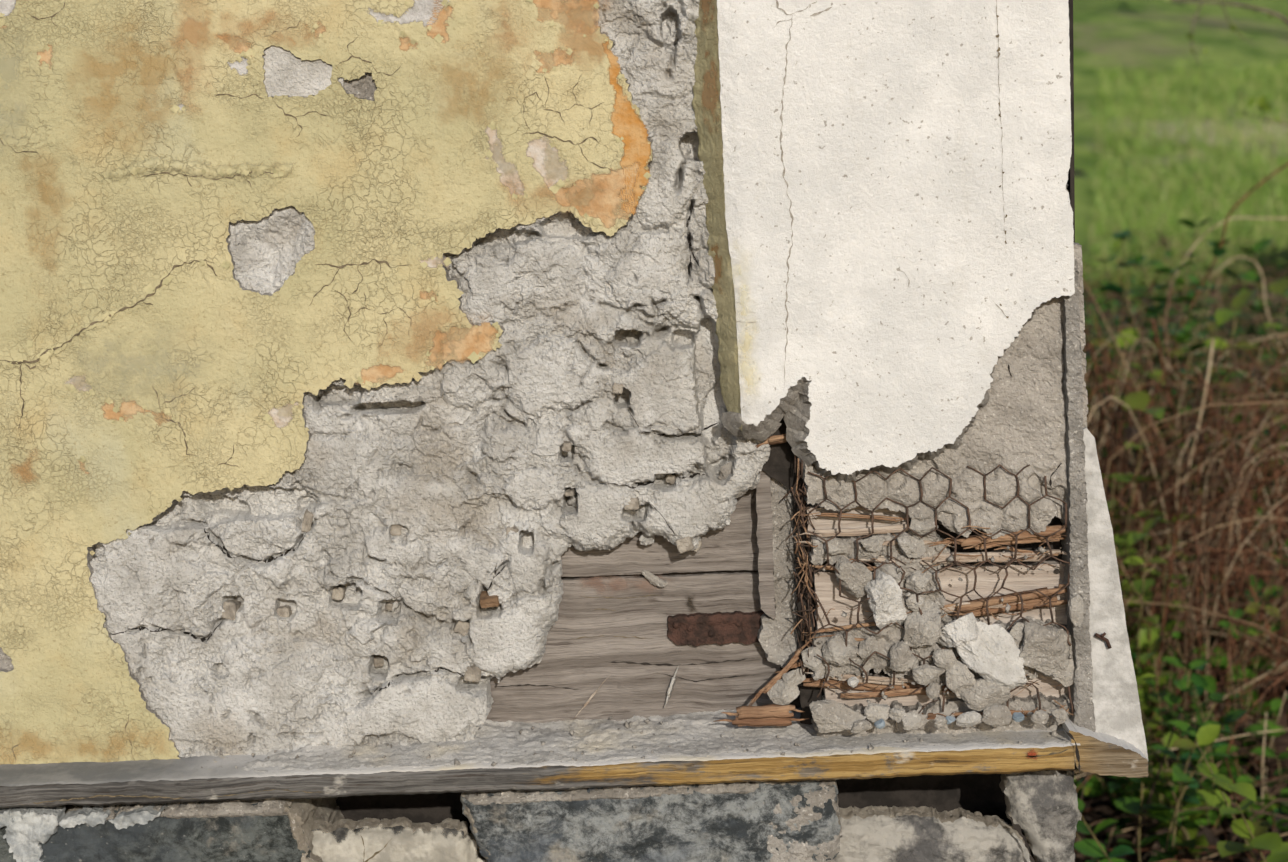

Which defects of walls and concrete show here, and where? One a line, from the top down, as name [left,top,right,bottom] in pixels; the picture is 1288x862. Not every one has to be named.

crack [522,73,616,172]
crack [737,0,832,384]
crack [4,259,230,429]
spalling [90,0,772,758]
spalling [802,242,1088,539]
spalling [0,647,14,671]